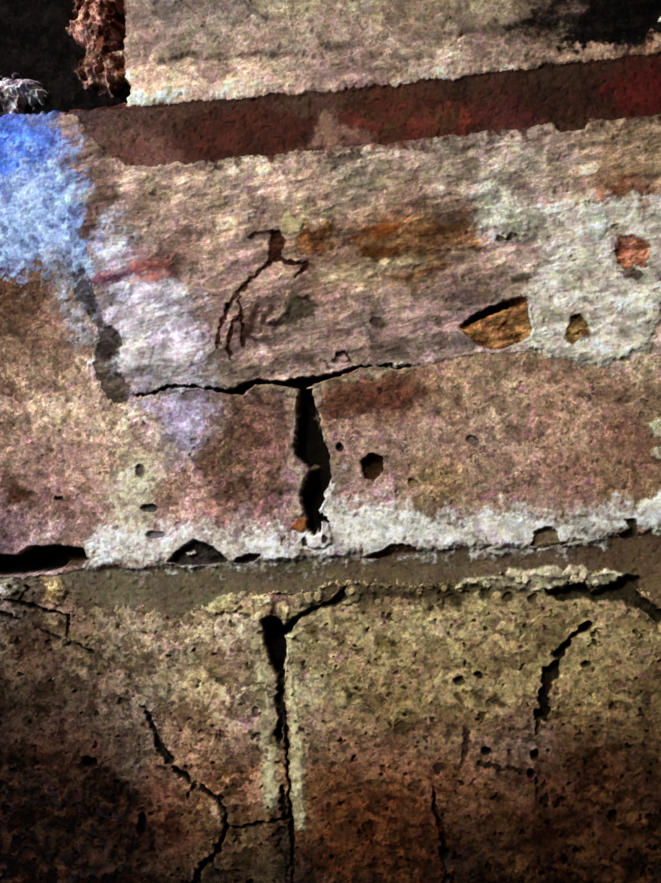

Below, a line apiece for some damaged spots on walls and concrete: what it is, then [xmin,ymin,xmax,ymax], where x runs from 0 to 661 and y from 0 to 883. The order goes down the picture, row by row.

crack [215,229,309,360]
rust [294,207,485,284]
spalling [461,297,531,349]
spalling [564,314,591,345]
spalling [615,234,651,279]
water stain [312,366,427,420]
crack [134,362,412,535]
water stain [83,381,648,574]
crack [0,576,94,654]
crack [140,588,347,883]
crack [432,621,592,883]